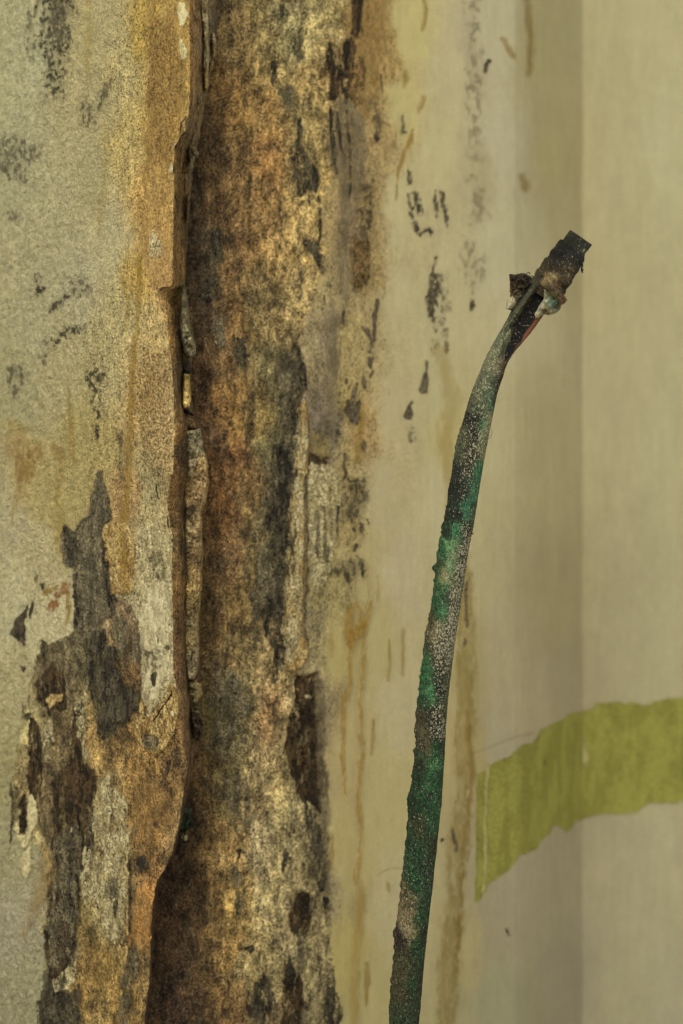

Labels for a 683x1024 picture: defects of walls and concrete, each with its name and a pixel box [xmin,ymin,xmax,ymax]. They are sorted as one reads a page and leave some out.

mould [25,0,78,102]
mould [0,136,41,183]
mould [407,170,449,237]
mould [38,324,86,366]
mould [48,279,91,316]
leakage [250,37,380,684]
mould [425,256,450,352]
leakage [133,346,173,504]
flaking render [8,0,349,1024]
leakage [83,523,174,740]
leakage [281,672,332,1024]
leakage [323,985,343,1024]